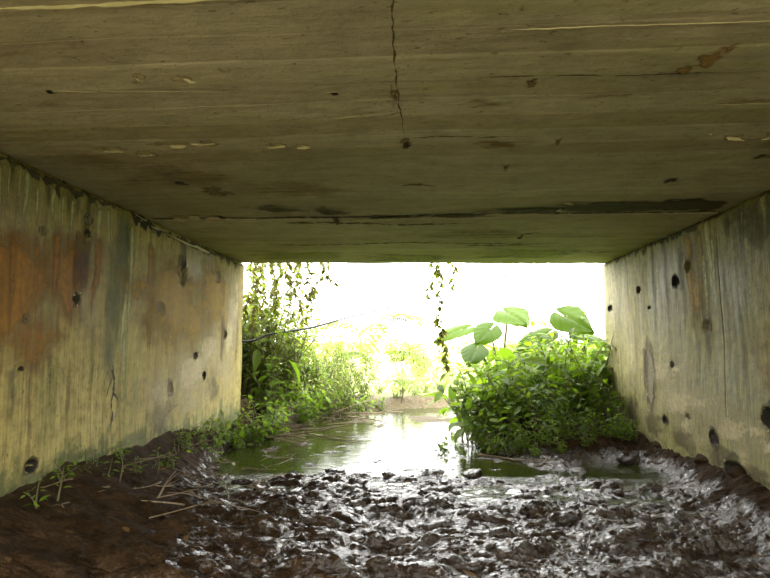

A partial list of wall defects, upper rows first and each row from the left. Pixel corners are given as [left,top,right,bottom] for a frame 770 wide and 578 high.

crack [366,0,525,148]
water stain [0,162,112,263]
water stain [360,198,728,219]
water stain [702,221,716,320]
crack [106,366,119,430]